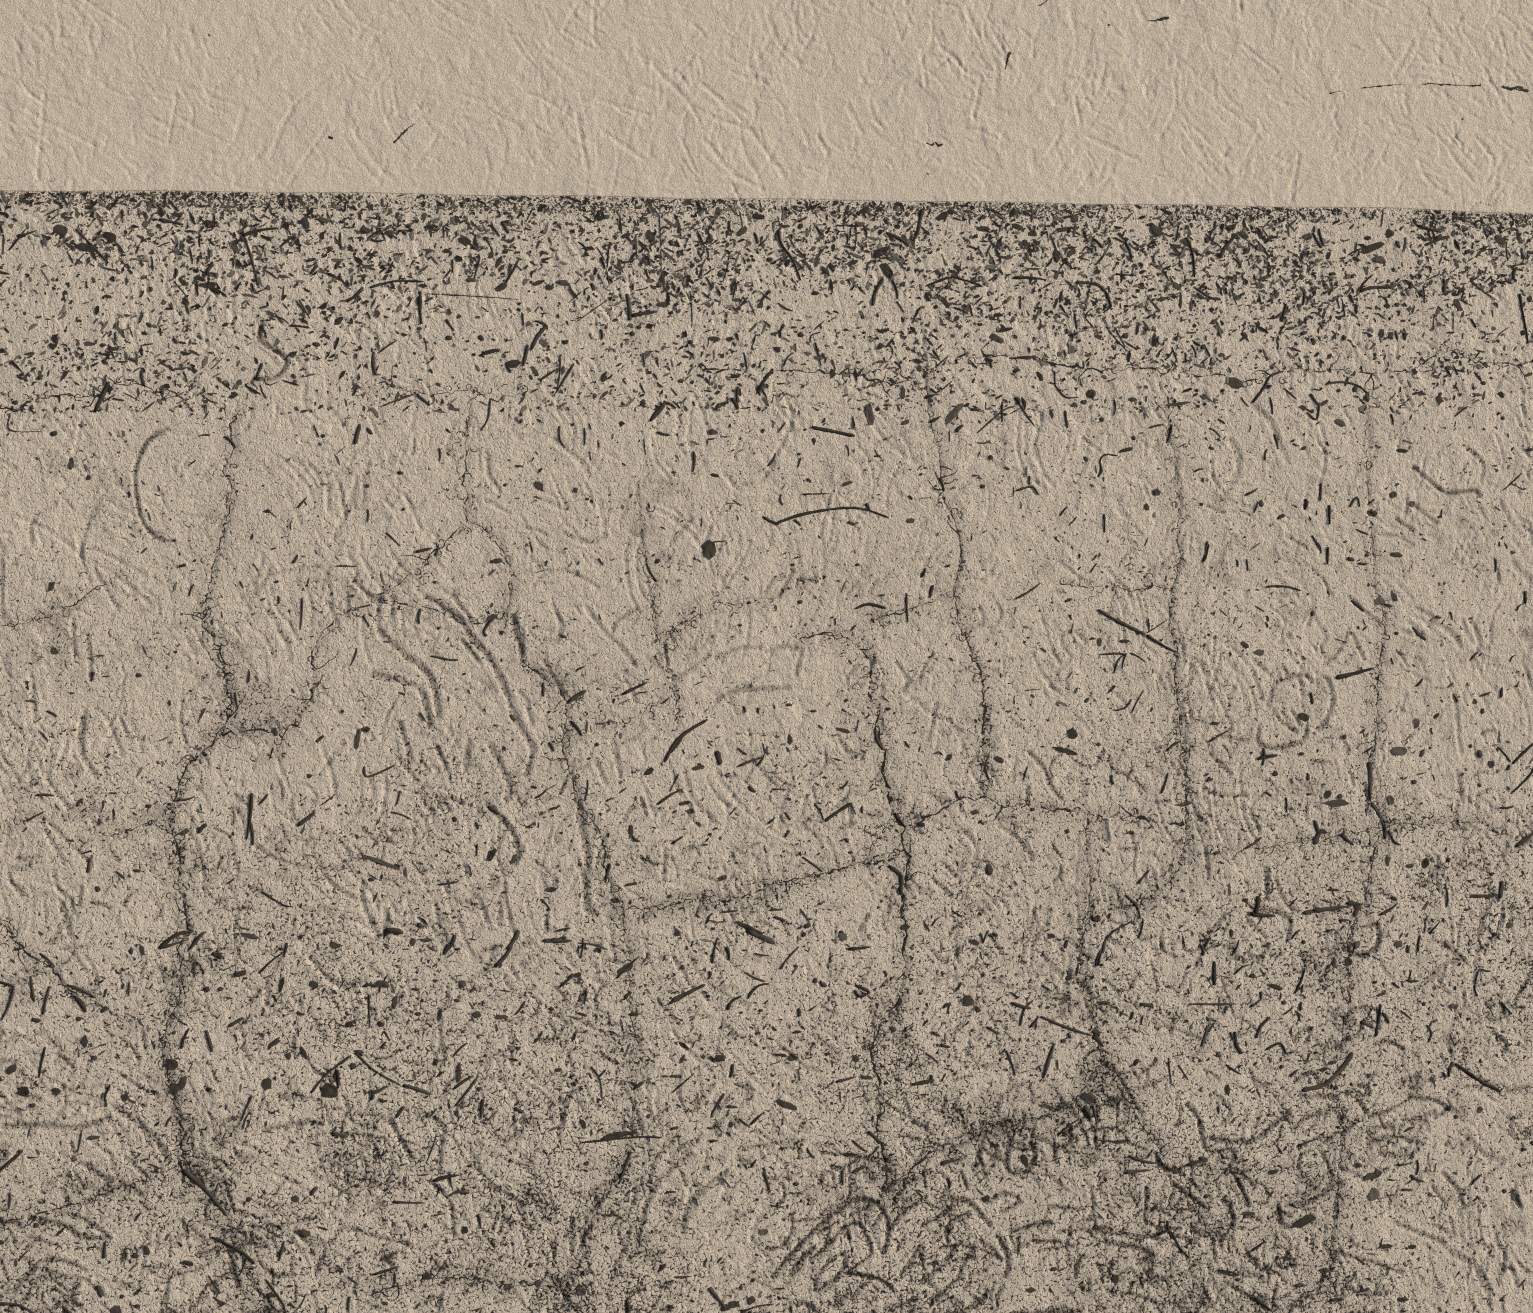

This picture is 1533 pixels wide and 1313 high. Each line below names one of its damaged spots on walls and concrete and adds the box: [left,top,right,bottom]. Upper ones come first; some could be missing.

crack [0,322,1533,1313]